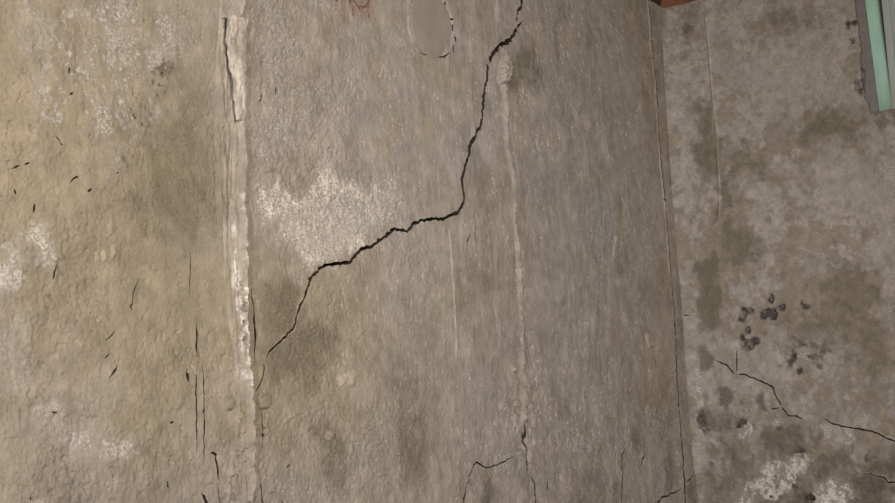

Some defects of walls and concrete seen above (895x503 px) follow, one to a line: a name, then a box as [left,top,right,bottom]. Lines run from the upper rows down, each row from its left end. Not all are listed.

crack [251,0,523,391]
crack [463,424,536,503]
water stain [692,338,722,479]
water stain [719,387,766,440]
crack [716,350,802,419]
water stain [734,453,895,503]
crack [823,418,895,442]